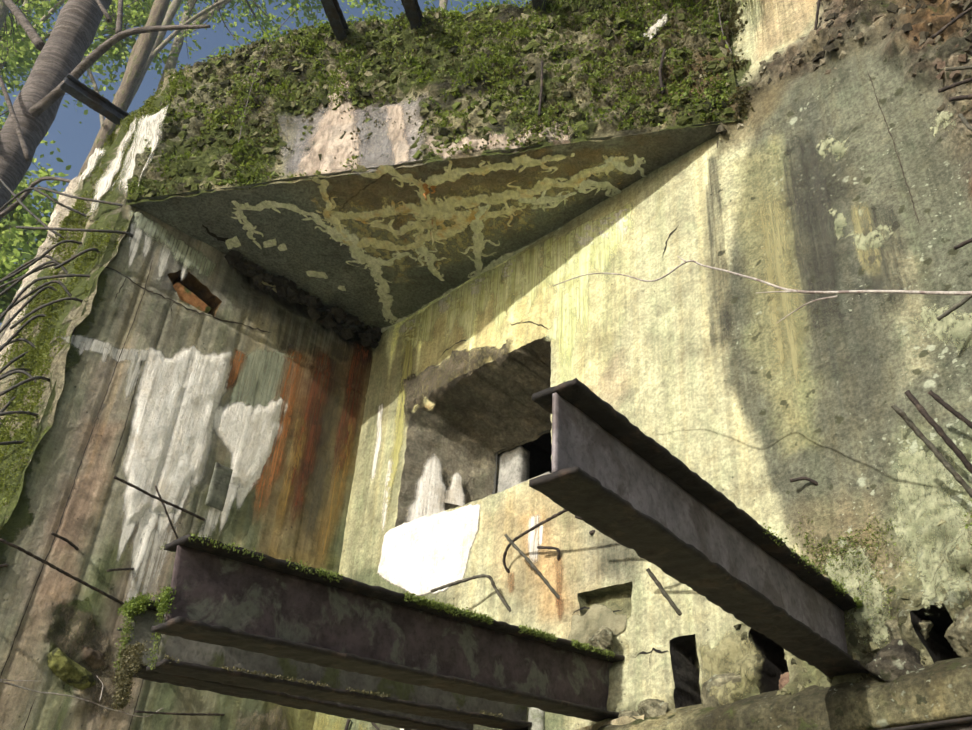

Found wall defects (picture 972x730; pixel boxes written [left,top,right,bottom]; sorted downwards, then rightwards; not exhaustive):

damp [225,153,646,370]
damp [708,158,729,344]
damp [759,137,835,381]
damp [853,207,903,300]
corrosion [224,350,245,389]
spalling [403,340,510,423]
crack [0,260,272,678]
spalling [113,476,205,539]
corrosion [254,351,306,518]
spalling [430,574,511,612]
spalling [502,509,582,599]
spalling [646,568,682,616]